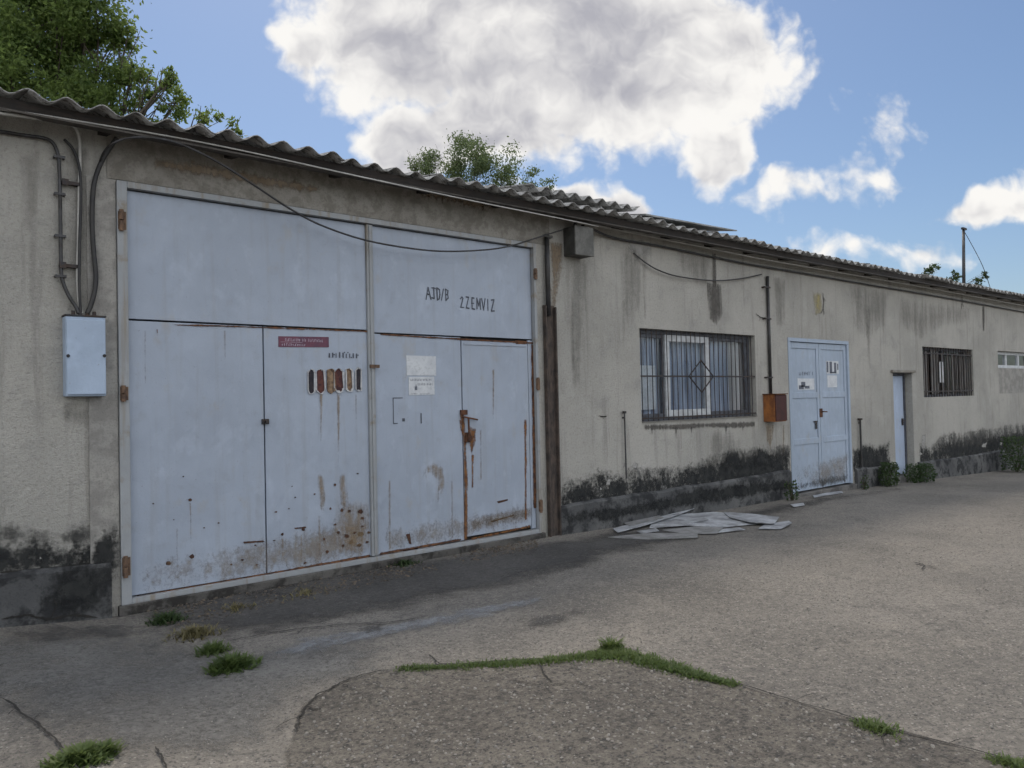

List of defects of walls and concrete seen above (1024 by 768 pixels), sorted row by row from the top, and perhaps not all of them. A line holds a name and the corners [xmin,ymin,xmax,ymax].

damp [707,254,722,321]
rust [141,334,536,596]
mould [561,444,890,523]
damp [920,425,1024,462]
damp [0,528,126,641]